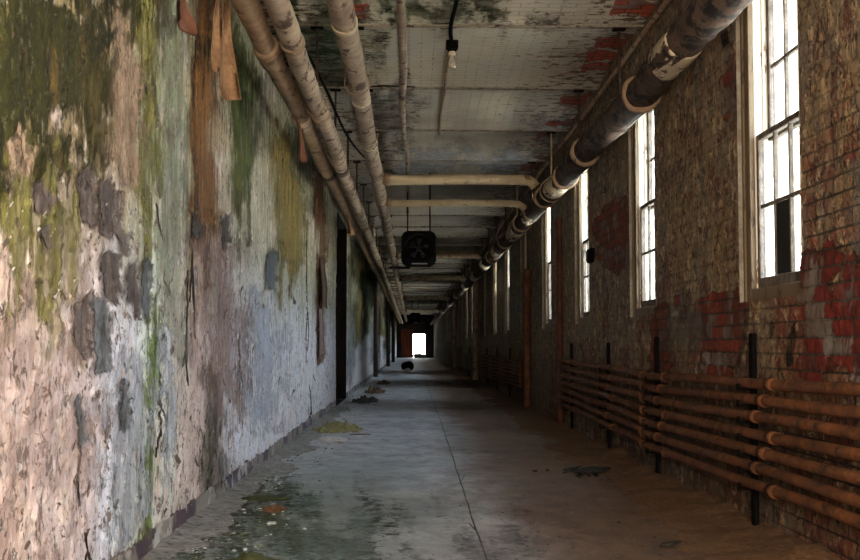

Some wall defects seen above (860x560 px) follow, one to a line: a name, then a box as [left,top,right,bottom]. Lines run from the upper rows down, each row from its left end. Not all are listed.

flaking render [581,37,631,72]
flaking render [2,178,68,252]
flaking render [31,165,194,531]
crack [155,367,167,458]
crack [182,40,201,386]
peeling [175,390,217,469]
corrosion [183,0,227,289]
crack [424,378,487,560]
flaking render [592,186,629,277]
flaking render [785,230,860,383]